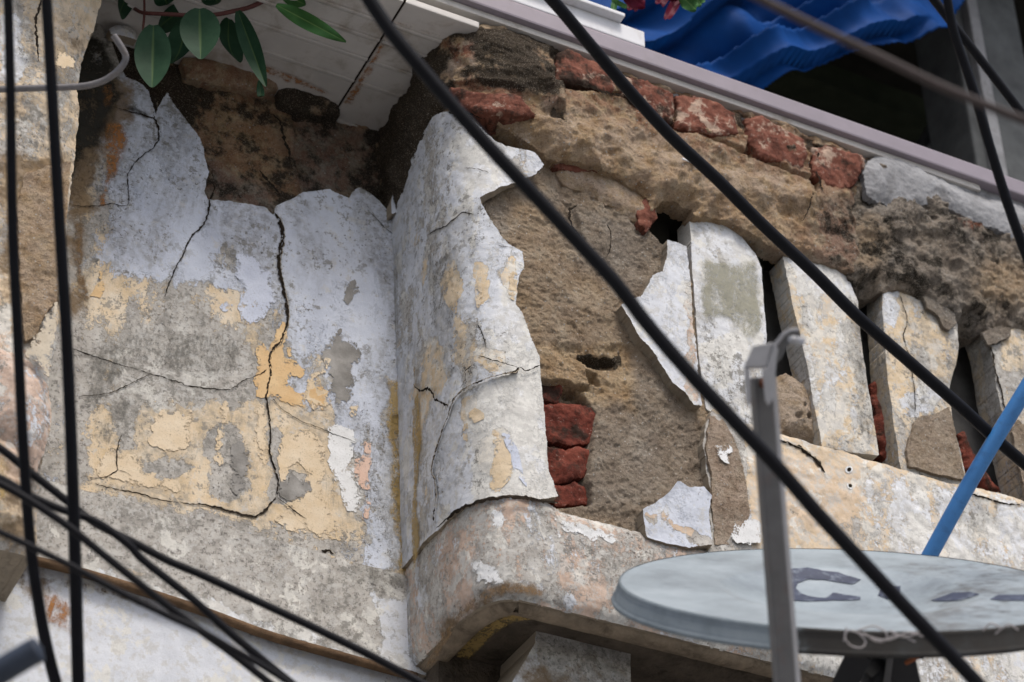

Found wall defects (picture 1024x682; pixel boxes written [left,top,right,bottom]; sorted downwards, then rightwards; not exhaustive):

crack [76,95,160,207]
spalling [106,25,449,220]
crack [272,114,291,163]
spalling [421,24,1024,350]
peeling [96,444,181,493]
peeling [148,408,194,451]
crack [74,171,350,518]
peeling [213,321,371,541]
peeling [344,279,359,305]
crack [413,324,558,528]
spalling [482,186,761,546]
peeling [471,560,504,586]